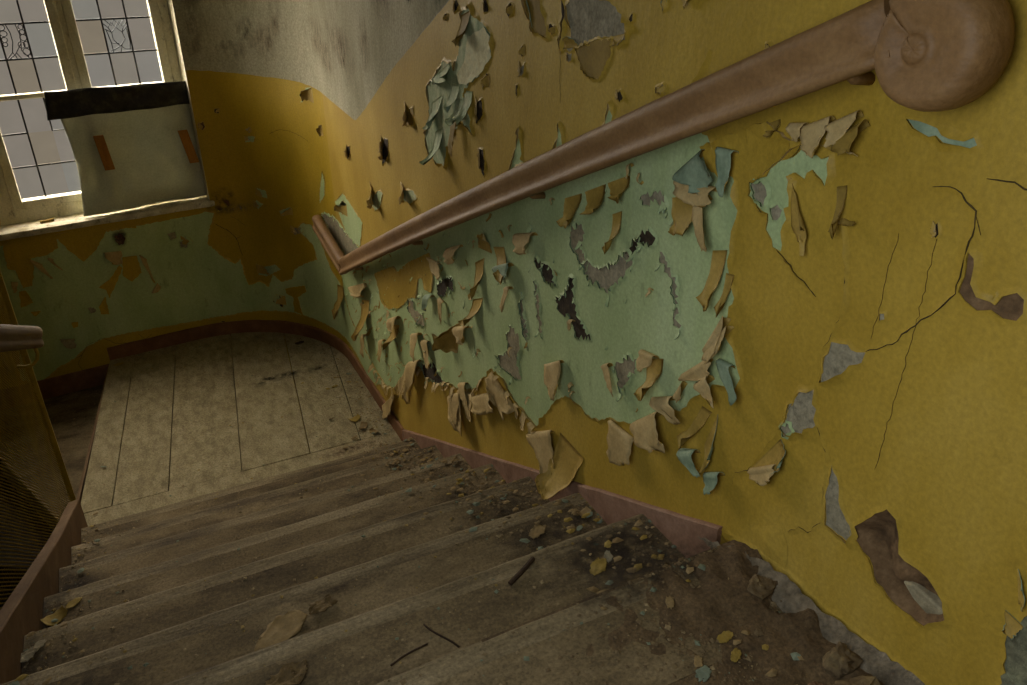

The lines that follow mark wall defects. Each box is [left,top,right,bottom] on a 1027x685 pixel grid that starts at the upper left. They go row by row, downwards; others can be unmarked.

peeling [402,0,494,178]
peeling [506,0,636,98]
crack [987,178,1027,191]
peeling [0,110,870,500]
crack [774,248,816,299]
crack [864,186,981,470]
flaking render [698,525,932,685]
flaking render [822,462,953,633]
peeling [992,569,1027,685]